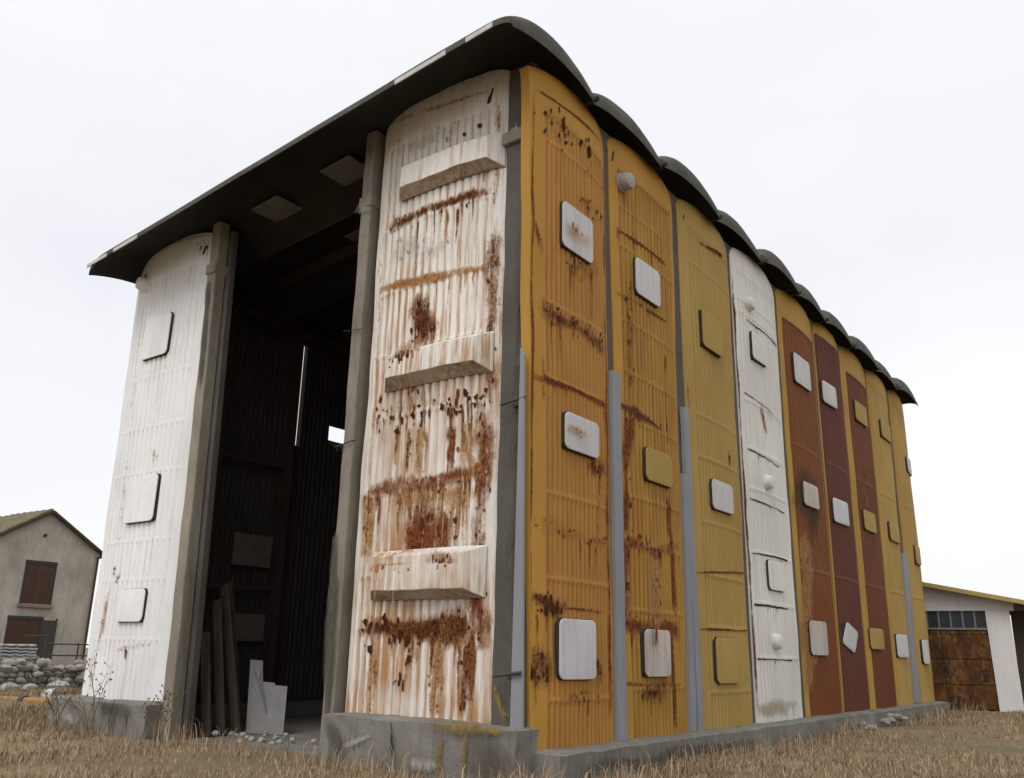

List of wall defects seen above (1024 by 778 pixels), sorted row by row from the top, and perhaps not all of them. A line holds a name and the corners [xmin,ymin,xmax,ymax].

corrosion [389,168,499,264]
corrosion [358,592,491,715]
corrosion [361,235,502,569]
corrosion [531,89,667,725]
corrosion [621,378,681,728]